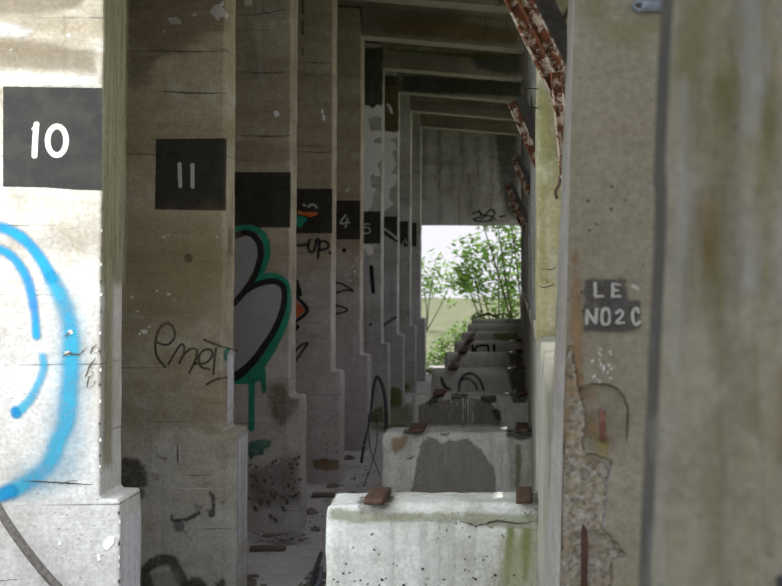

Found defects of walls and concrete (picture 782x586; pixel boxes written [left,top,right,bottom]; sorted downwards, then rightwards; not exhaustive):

water stain [0,44,86,69]
water stain [508,313,532,403]
water stain [411,438,495,493]
water stain [418,393,532,486]
spalling [561,347,624,586]
water stain [500,527,536,586]